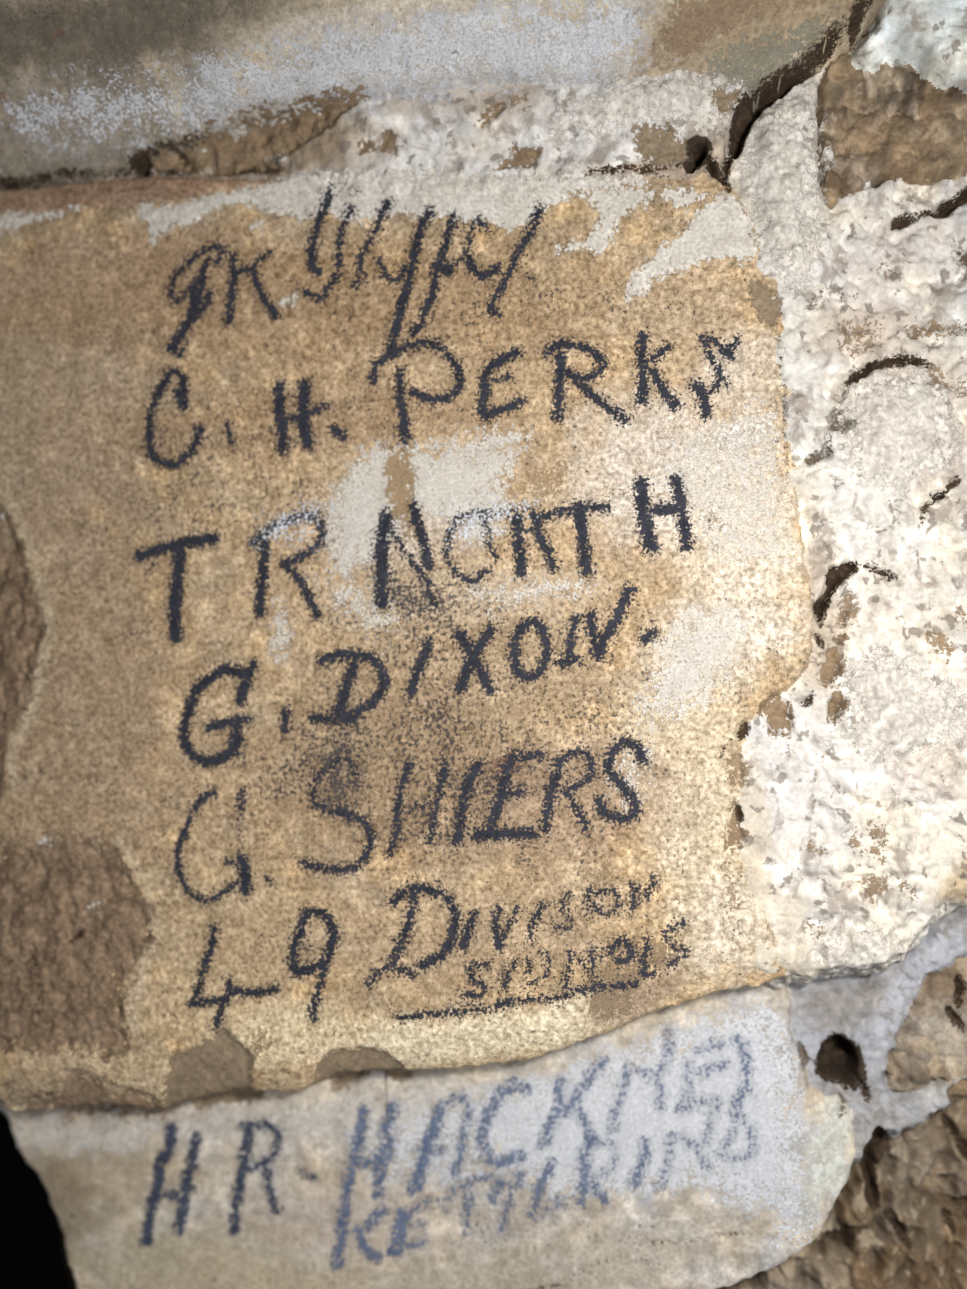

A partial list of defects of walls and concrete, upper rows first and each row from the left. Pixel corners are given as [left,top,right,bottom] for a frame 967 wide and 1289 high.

efflorescence [0,0,647,159]
crack [720,0,873,178]